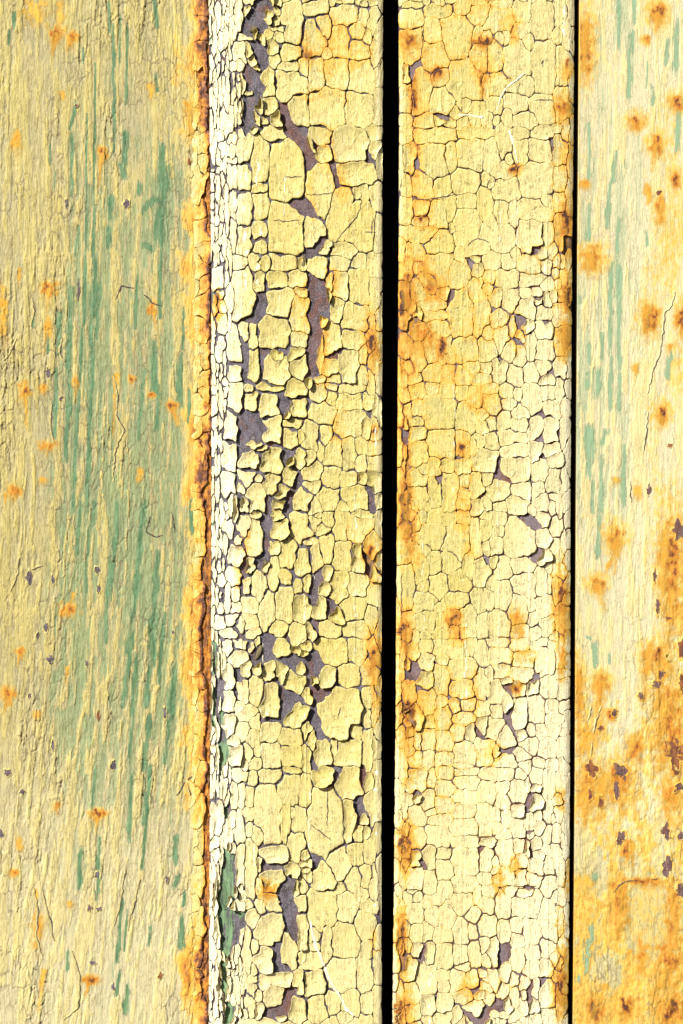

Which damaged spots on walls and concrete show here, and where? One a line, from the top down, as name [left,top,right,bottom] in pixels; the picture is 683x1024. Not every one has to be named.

peeling [232,0,341,189]
peeling [283,177,317,218]
rust [643,172,681,224]
peeling [223,236,341,575]
peeling [340,394,382,529]
peeling [351,543,382,583]
crack [176,0,602,1024]
rust [399,265,447,373]
rust [640,304,660,337]
rust [557,517,683,825]
peeling [222,557,379,1024]
rust [587,839,683,1024]